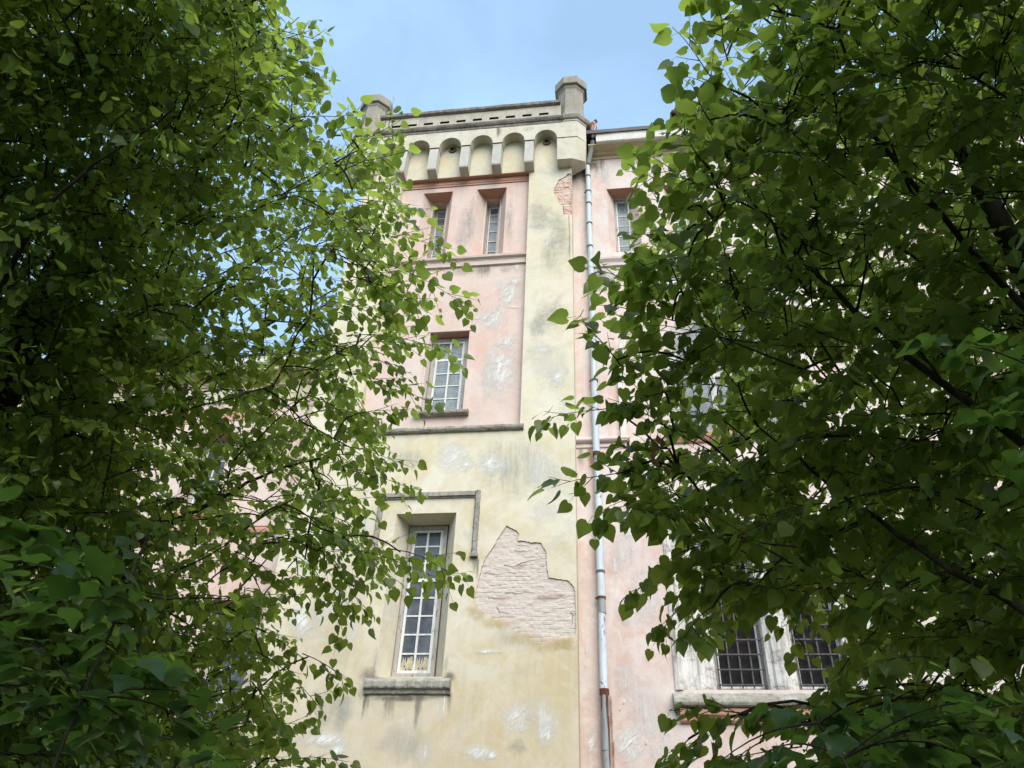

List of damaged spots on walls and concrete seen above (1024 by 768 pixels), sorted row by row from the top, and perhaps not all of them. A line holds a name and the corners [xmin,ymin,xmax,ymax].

spalling [554,173,572,215]
spalling [475,526,576,643]